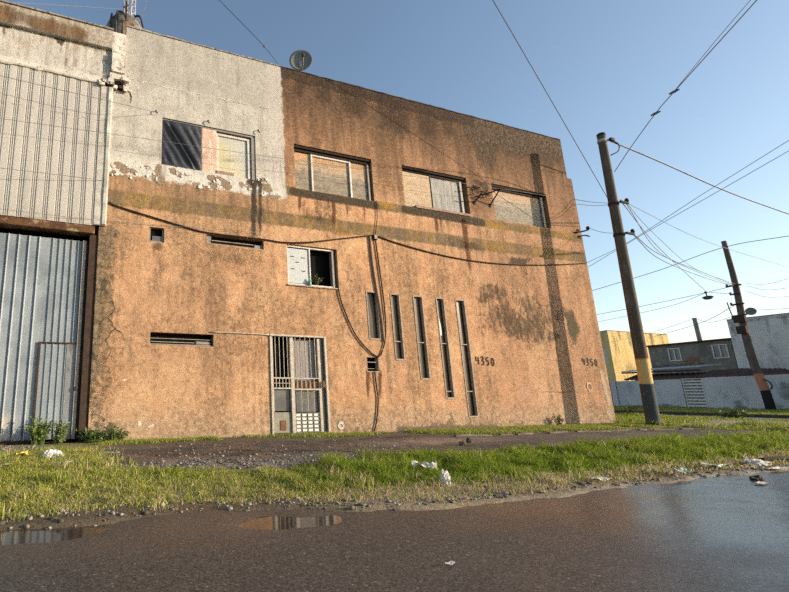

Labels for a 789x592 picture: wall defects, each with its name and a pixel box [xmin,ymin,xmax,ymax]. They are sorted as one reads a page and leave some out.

corrosion [0,5,86,40]
leakage [281,68,563,171]
peeling [109,161,281,200]
crack [98,298,125,361]
leakage [479,284,580,346]